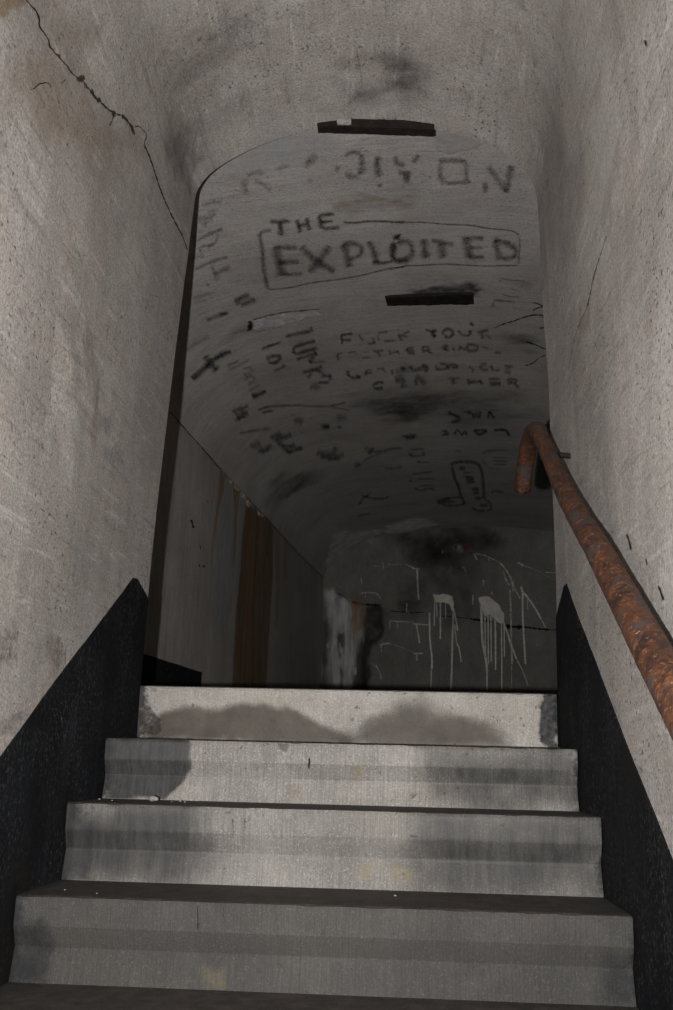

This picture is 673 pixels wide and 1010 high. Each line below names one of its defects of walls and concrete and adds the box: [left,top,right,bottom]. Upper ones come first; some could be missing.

crack [26,0,188,250]
corrosion [219,471,273,688]